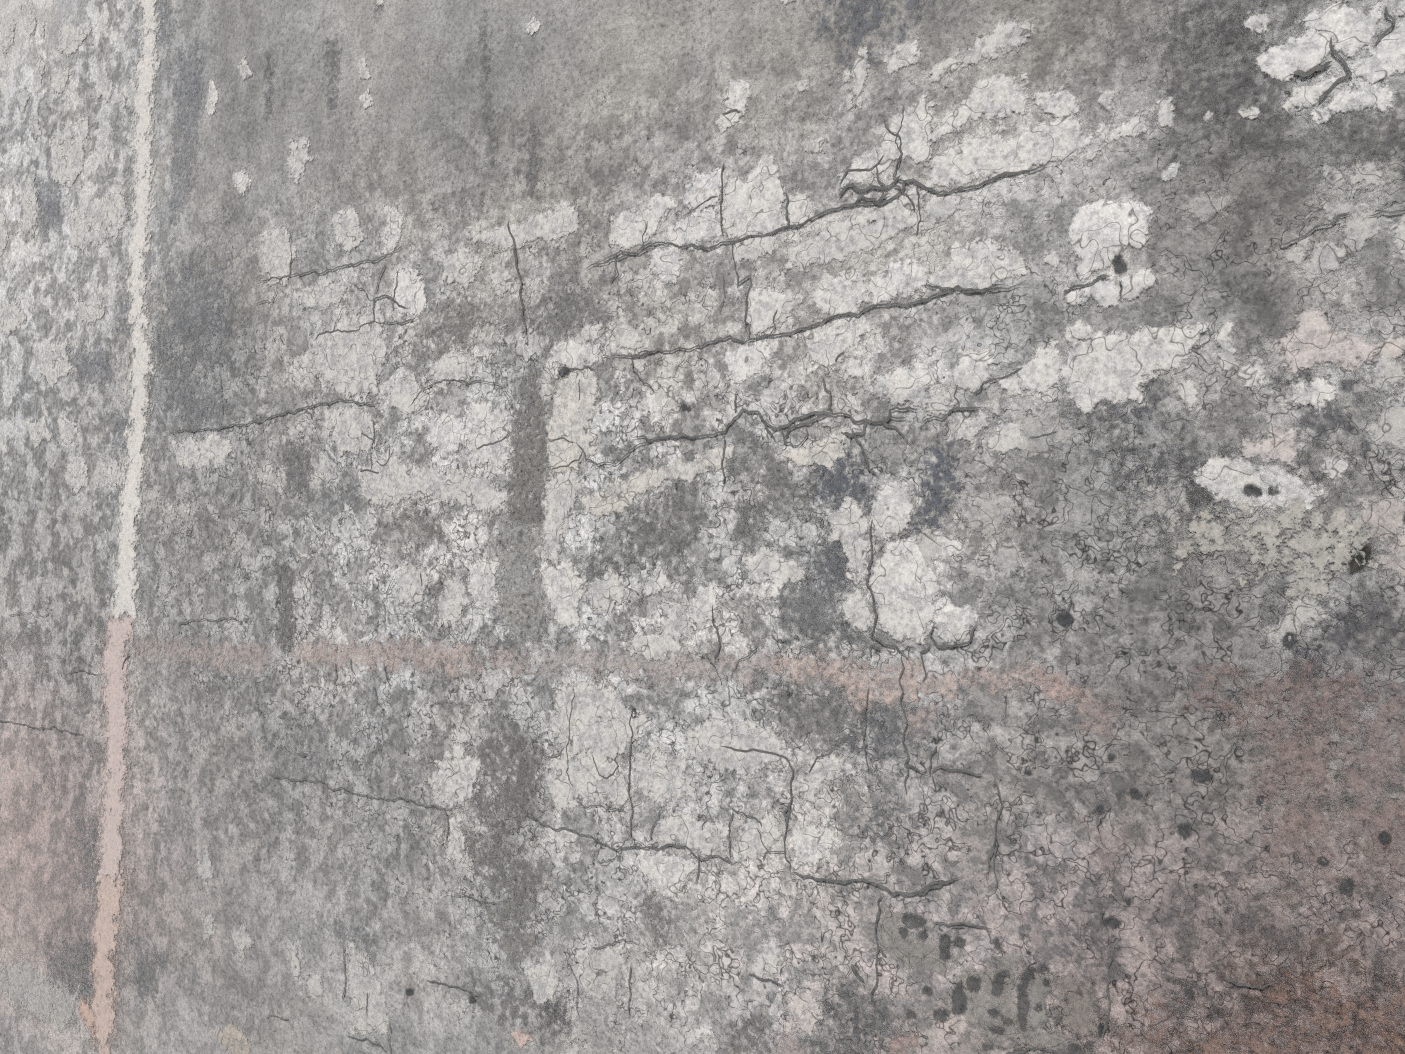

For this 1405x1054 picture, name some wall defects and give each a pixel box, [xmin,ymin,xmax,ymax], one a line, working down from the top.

damp [154,0,205,224]
crack [256,231,419,341]
crack [550,351,1022,484]
crack [560,105,1123,401]
peeling [609,17,1175,388]
damp [1080,386,1165,431]
peeling [923,159,1405,457]
damp [1170,0,1291,159]
peeling [1243,0,1405,124]
damp [1297,399,1352,442]
peeling [542,677,858,898]
crack [519,519,1003,1017]